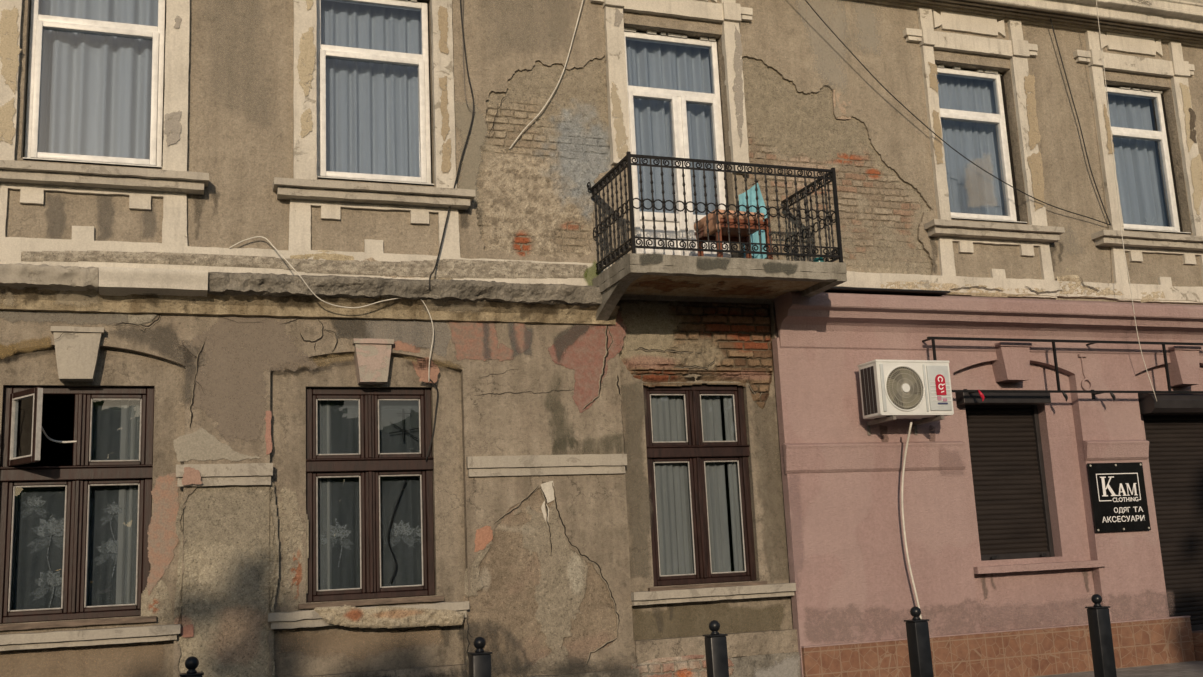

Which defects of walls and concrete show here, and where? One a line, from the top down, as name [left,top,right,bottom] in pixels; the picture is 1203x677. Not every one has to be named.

peeling [0,6,22,145]
spalling [475,56,628,259]
spalling [732,25,1046,297]
peeling [1180,83,1203,215]
crack [114,314,161,332]
crack [182,318,338,428]
flaking render [548,300,773,413]
spalling [147,316,317,677]
crack [494,482,620,665]
crack [380,615,470,672]
flaking render [631,654,707,677]